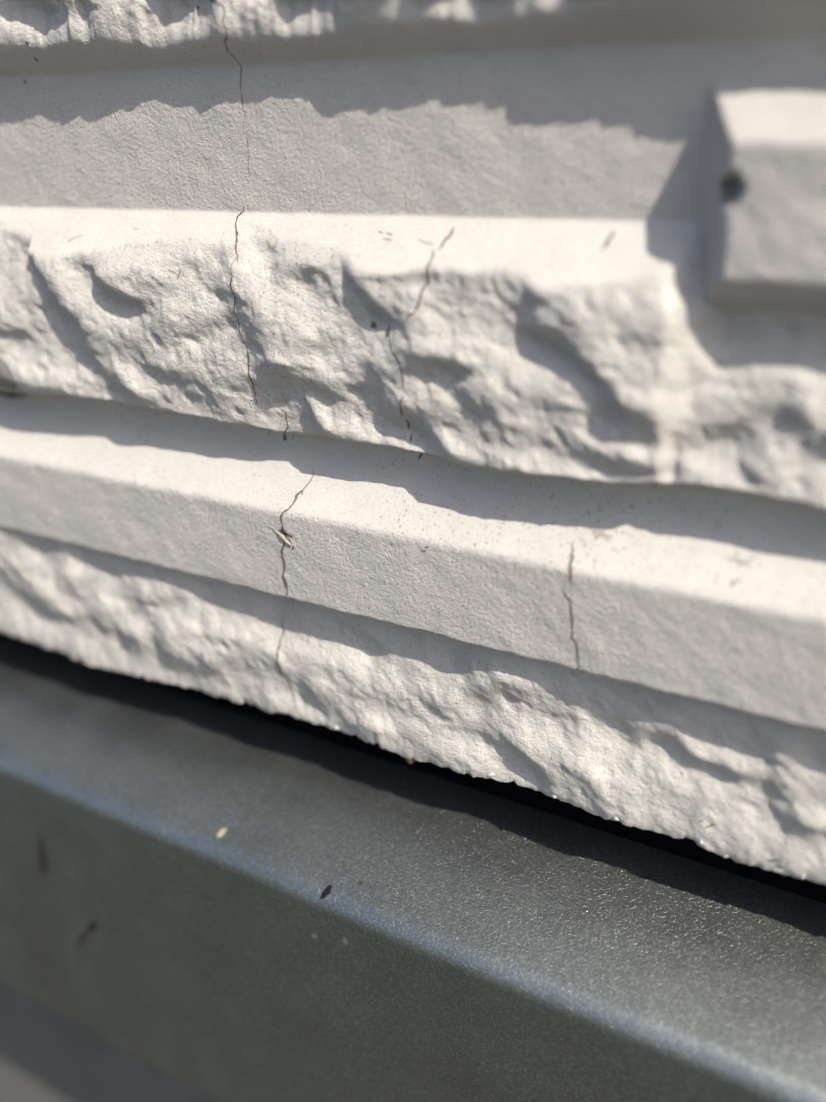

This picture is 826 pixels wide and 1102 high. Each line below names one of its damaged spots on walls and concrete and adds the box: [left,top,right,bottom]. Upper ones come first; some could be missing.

crack [214,1,250,177]
crack [230,207,294,438]
crack [388,227,454,460]
crack [269,471,314,721]
crack [562,540,582,676]